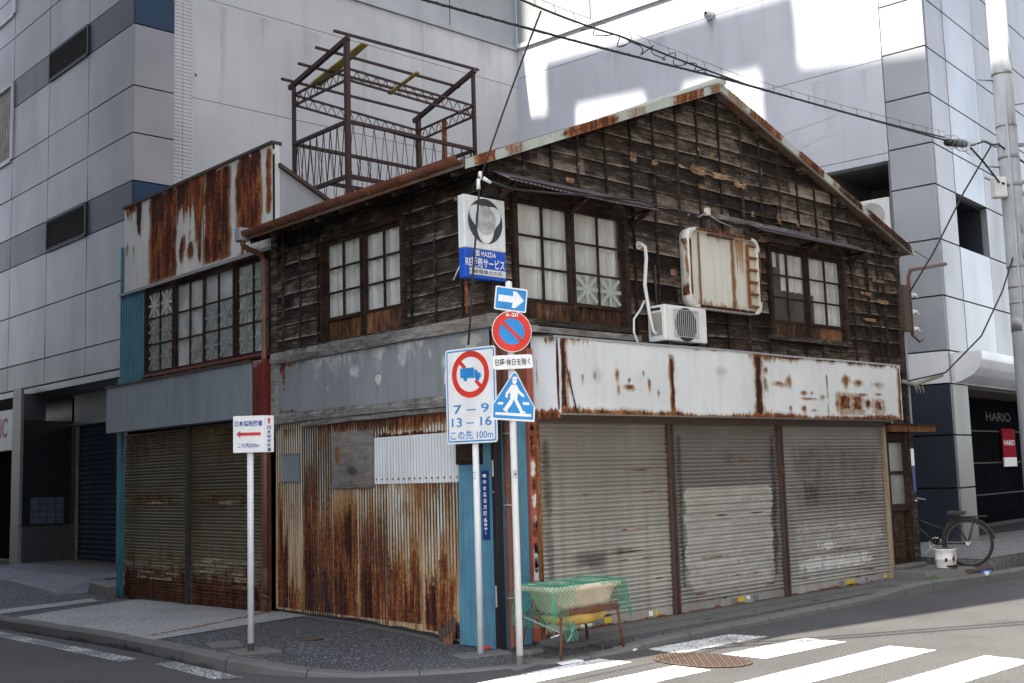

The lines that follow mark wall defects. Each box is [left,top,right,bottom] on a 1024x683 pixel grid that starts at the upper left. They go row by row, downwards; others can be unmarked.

rust [474,142,522,165]
rust [563,106,644,137]
rust [126,148,272,284]
rust [681,227,762,314]
rust [319,413,447,451]
rust [535,337,902,582]
rust [124,459,460,639]